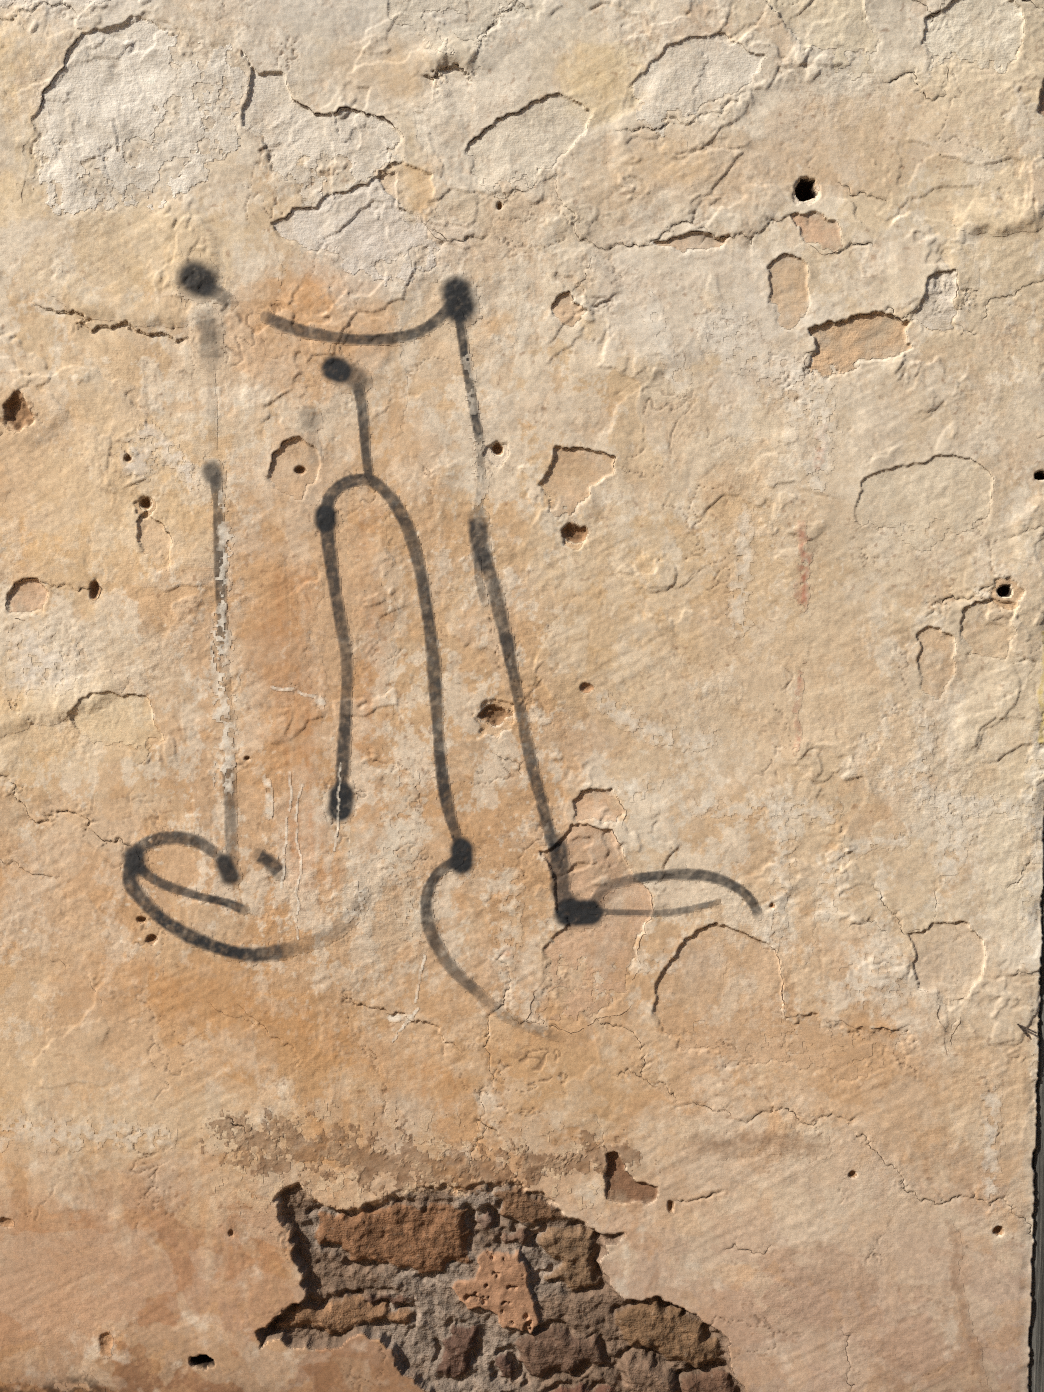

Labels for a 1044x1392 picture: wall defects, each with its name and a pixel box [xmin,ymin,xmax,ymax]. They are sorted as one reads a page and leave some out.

crack [427,0,529,81]
crack [883,65,949,101]
crack [506,175,799,290]
spalling [767,181,959,378]
crack [341,954,560,1179]
crack [602,1023,1033,1236]
spalling [208,1105,746,1392]